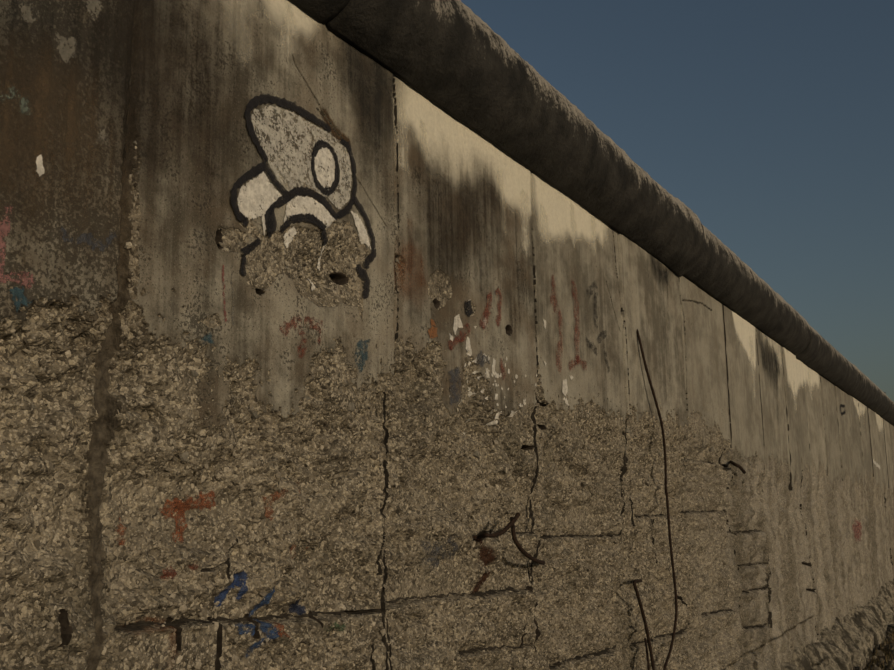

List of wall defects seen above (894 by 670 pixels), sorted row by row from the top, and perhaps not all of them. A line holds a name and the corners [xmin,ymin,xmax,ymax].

crack [392,78,400,341]
water stain [344,43,608,265]
crack [343,392,393,670]
spalling [0,135,894,670]
crack [527,211,547,583]